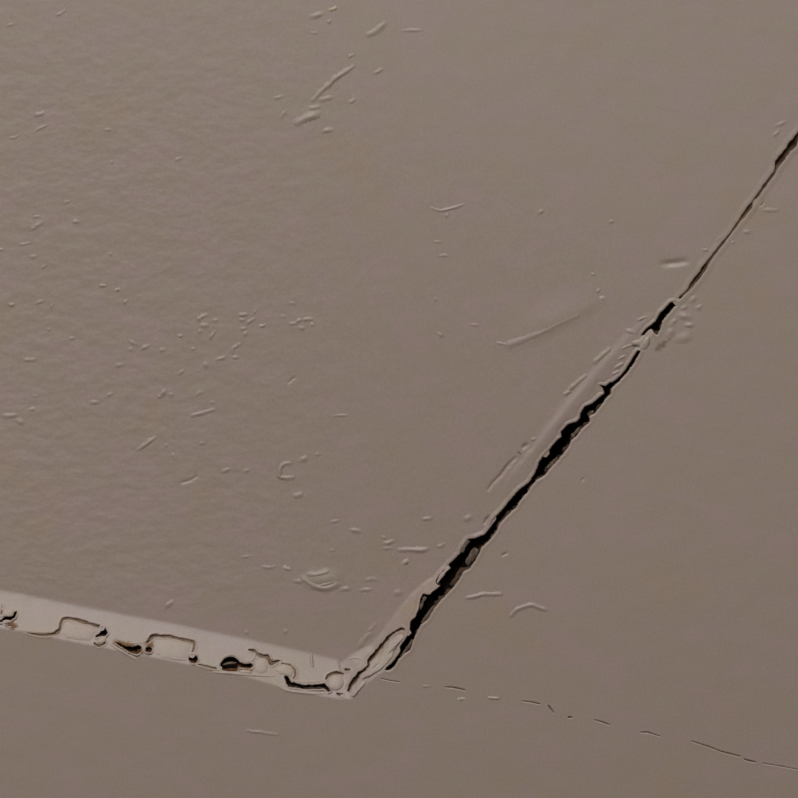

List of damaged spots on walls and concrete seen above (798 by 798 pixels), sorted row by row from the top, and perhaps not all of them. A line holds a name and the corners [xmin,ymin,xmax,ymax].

crack [344,122,798,696]
crack [518,697,613,728]
crack [687,738,798,773]